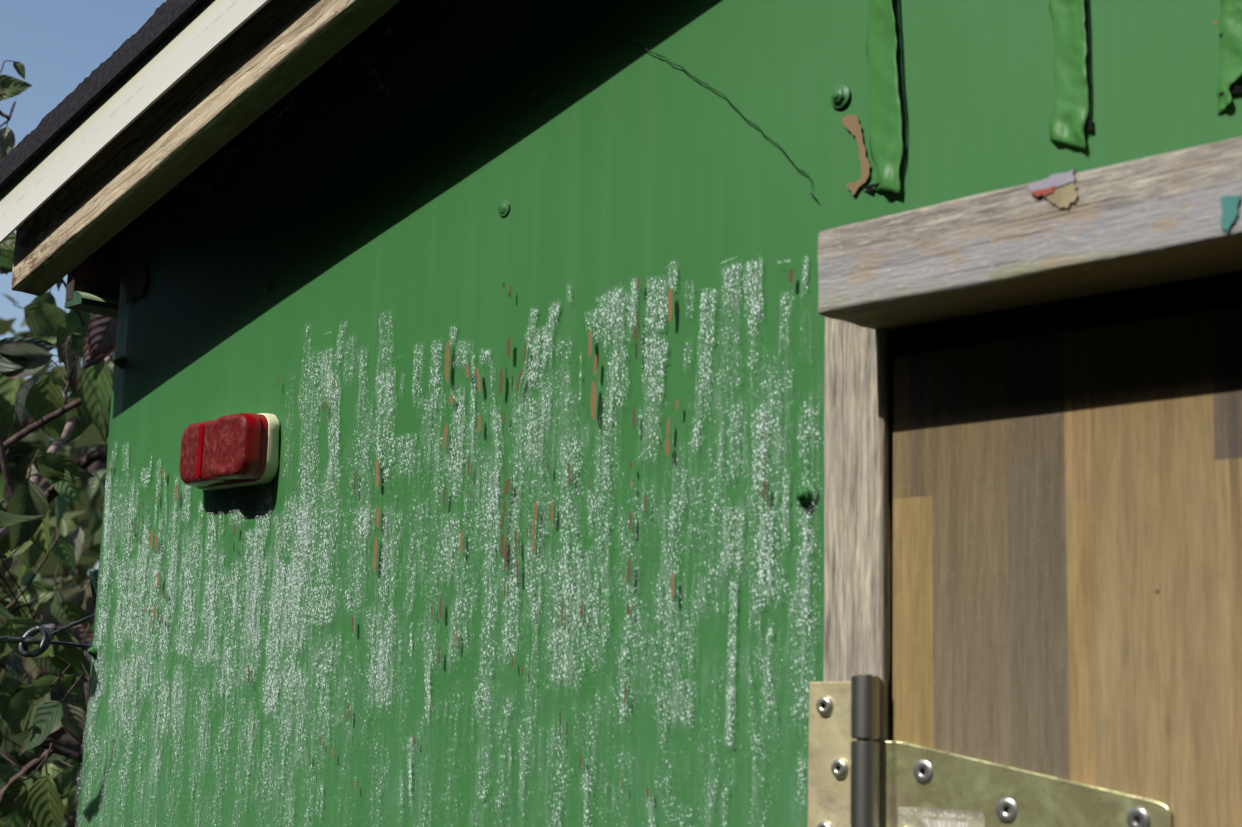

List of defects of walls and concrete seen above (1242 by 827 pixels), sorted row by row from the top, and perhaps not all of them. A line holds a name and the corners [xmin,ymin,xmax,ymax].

crack [513,26,819,201]
spalling [1215,83,1242,96]
peeling [842,114,871,195]